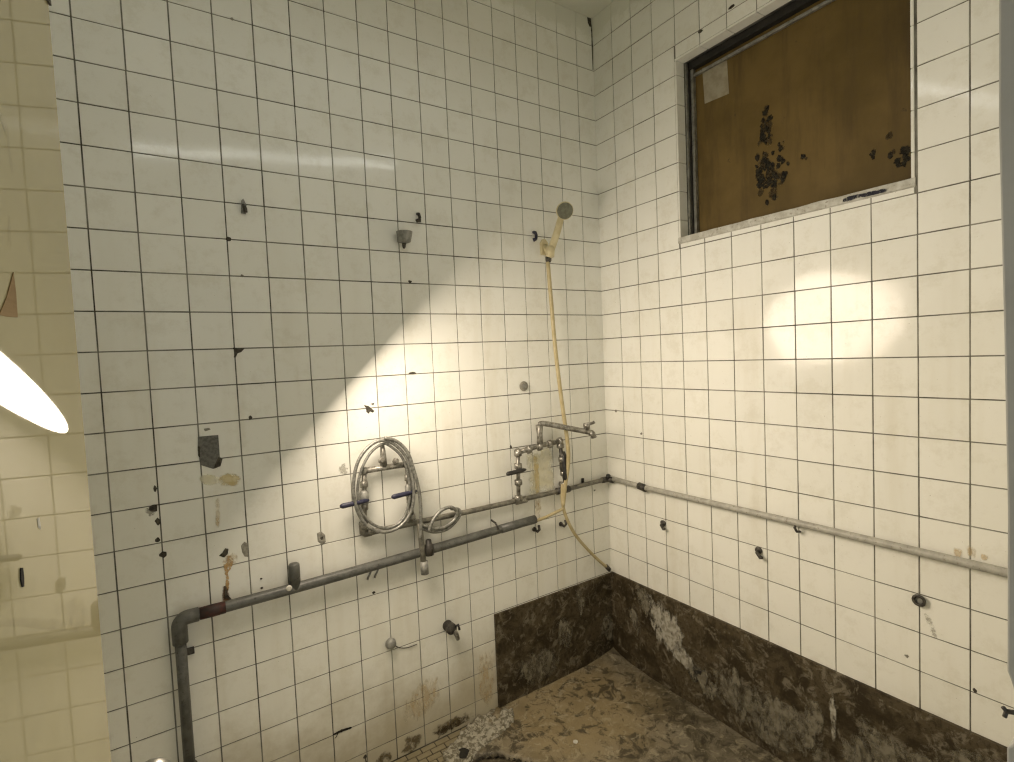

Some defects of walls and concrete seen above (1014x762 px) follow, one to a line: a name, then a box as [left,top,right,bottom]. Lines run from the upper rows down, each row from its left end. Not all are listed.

peeling [0,272,18,317]
spalling [198,428,222,469]
corrosion [219,548,233,601]
leakage [521,619,572,685]
leakage [630,589,938,762]